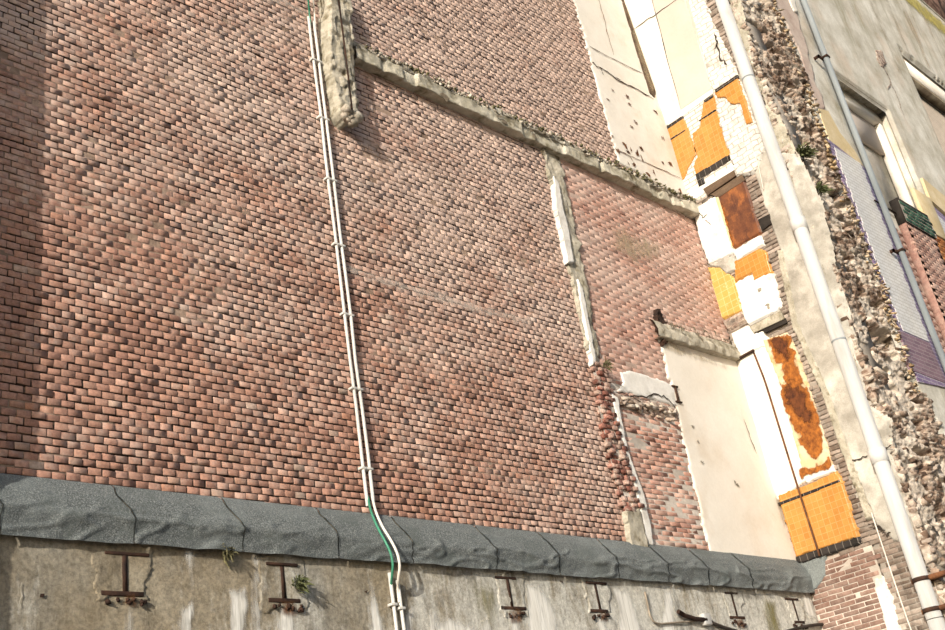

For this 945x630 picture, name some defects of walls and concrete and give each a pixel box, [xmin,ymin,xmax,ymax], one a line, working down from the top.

spalling [614,393,678,422]
rust [768,334,831,479]
leakage [181,604,193,630]
leakage [230,590,259,630]
leakage [277,610,293,630]
leakage [371,597,382,630]
leakage [430,615,489,630]
leakage [510,585,557,630]
leakage [614,588,641,630]